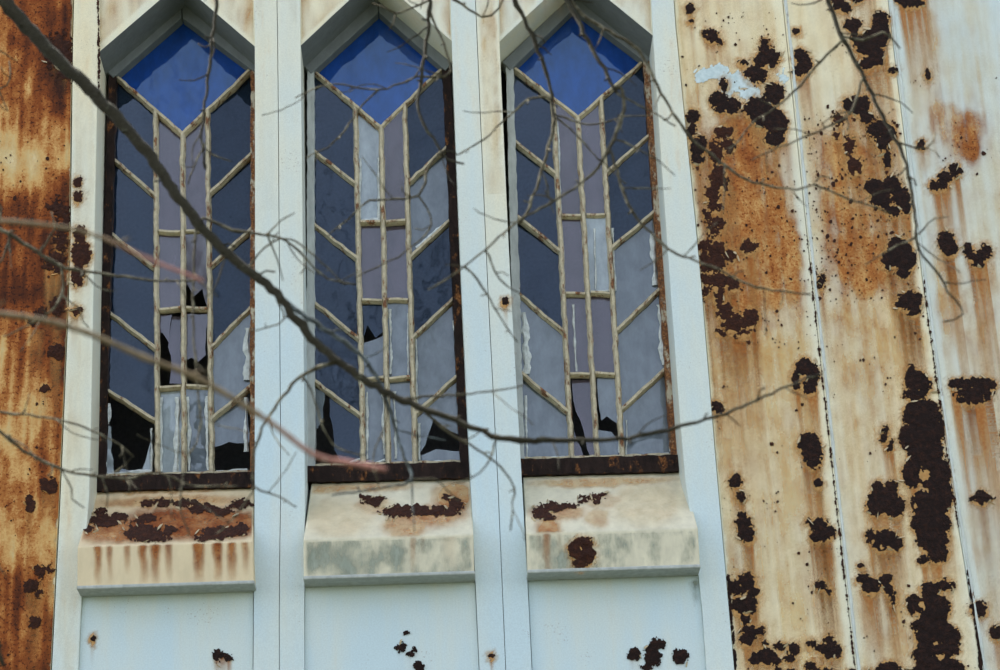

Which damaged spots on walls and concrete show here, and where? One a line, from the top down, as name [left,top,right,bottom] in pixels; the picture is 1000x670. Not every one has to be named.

corrosion [685,2,725,47]
peeling [693,62,761,101]
corrosion [0,0,94,670]
corrosion [684,26,854,670]
corrosion [809,0,1000,670]
corrosion [84,491,252,569]
corrosion [386,484,469,534]
corrosion [538,507,579,544]
corrosion [566,535,597,568]
corrosion [212,648,234,668]
corrosion [394,630,425,670]
corrosion [627,636,689,670]